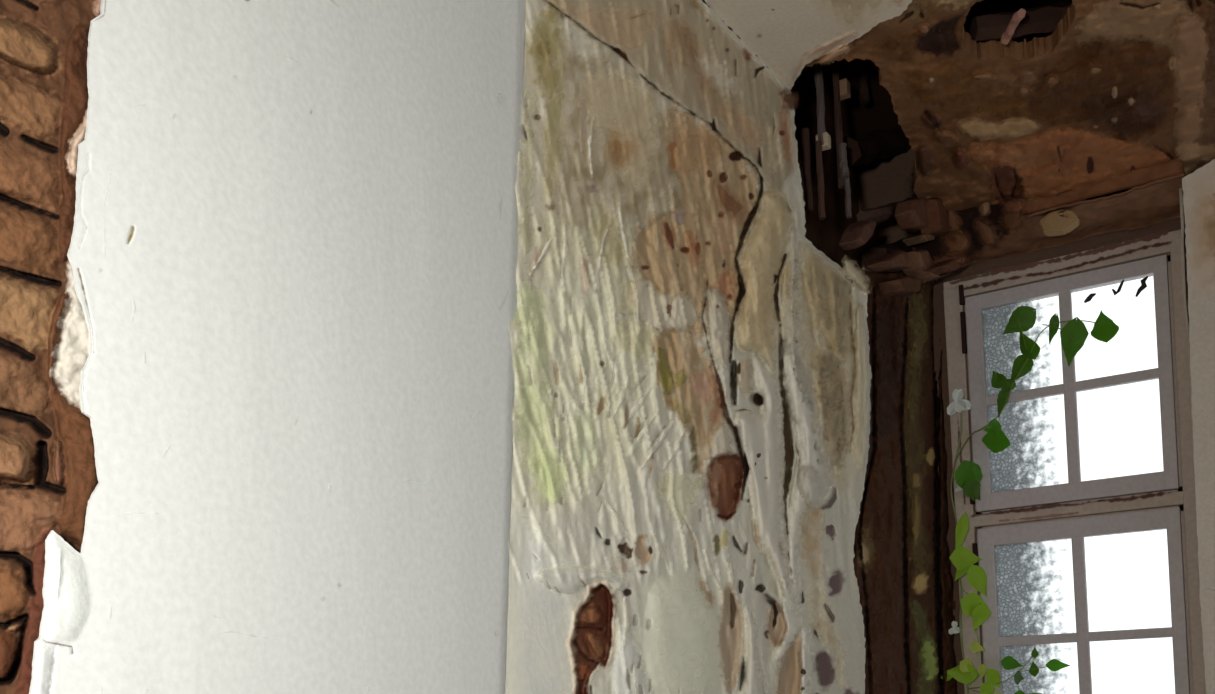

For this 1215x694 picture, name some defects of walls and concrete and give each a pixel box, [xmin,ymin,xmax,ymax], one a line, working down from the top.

spalling [907,0,968,56]
spalling [959,0,1215,205]
spalling [839,197,1171,296]
flaking render [0,0,101,694]
crack [528,263,665,477]
spalling [551,0,835,694]
crack [550,3,965,694]
flaking render [854,307,864,467]
flaking render [829,571,844,595]
spalling [912,474,920,544]
spalling [914,574,926,593]
peeling [972,492,1170,522]